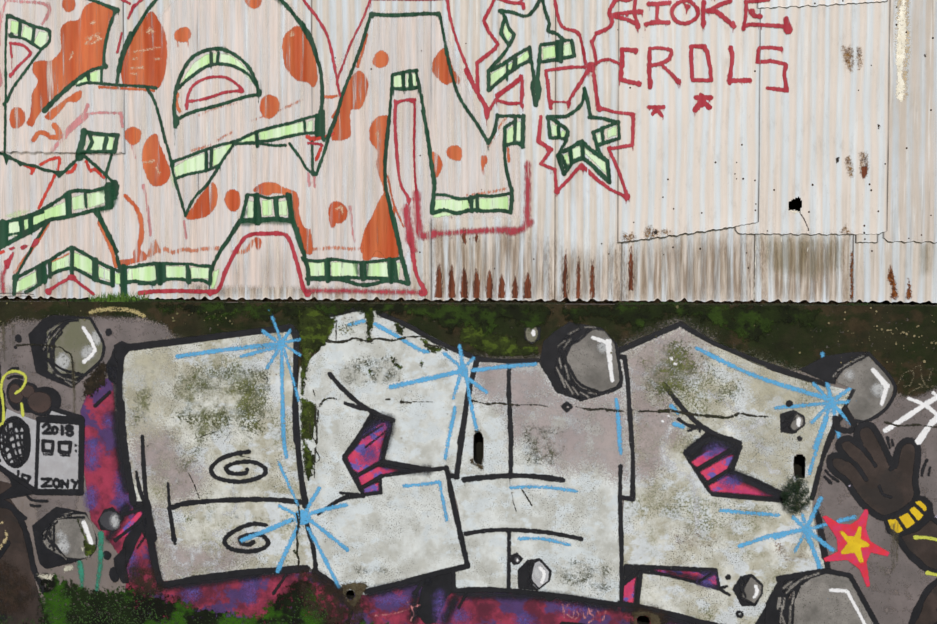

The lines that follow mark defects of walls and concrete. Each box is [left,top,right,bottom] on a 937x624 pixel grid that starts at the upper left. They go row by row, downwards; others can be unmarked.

corrosion [843,46,862,70]
corrosion [845,153,868,179]
corrosion [435,265,531,298]
corrosion [562,255,595,298]
corrosion [887,267,912,300]